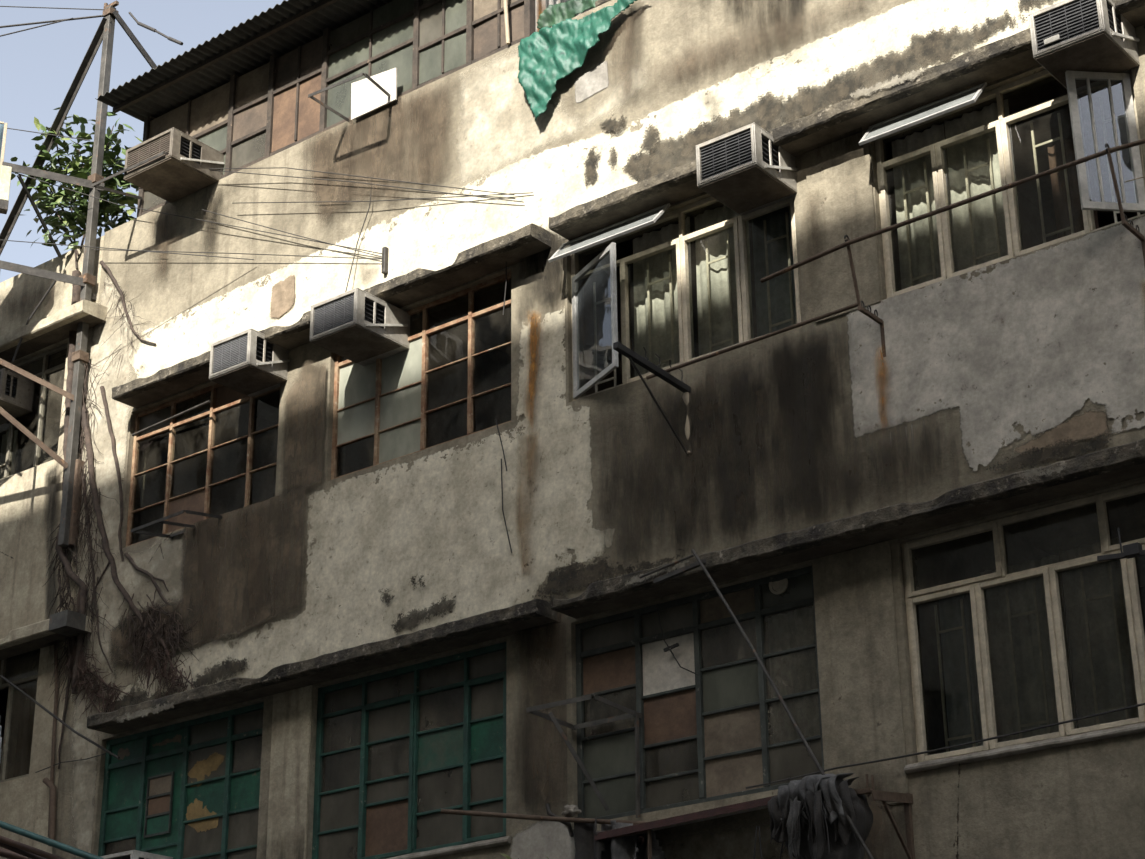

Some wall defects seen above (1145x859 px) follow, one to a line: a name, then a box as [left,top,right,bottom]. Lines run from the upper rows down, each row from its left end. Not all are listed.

water stain [581,0,1053,186]
peeling [72,431,129,853]
peeling [113,307,615,724]
rust [518,434,536,574]
rust [527,314,539,414]
peeling [84,0,1067,610]
water stain [532,338,939,600]
peeling [847,216,1145,472]